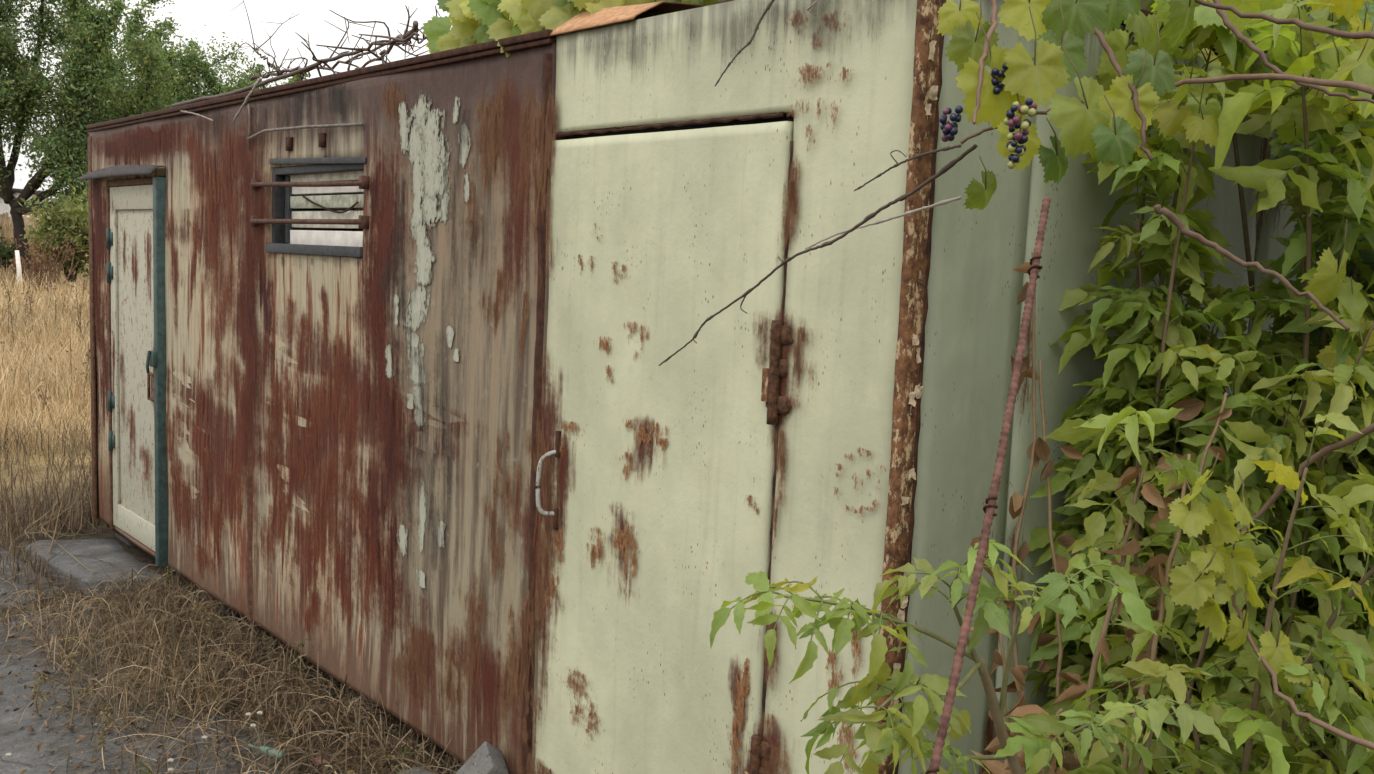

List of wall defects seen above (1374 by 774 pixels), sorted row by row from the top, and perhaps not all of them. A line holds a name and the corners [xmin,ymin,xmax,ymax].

corrosion [92,83,580,774]
peeling [397,478,446,589]
peeling [385,91,471,428]
corrosion [563,669,604,742]
corrosion [463,9,852,593]
corrosion [726,612,788,774]